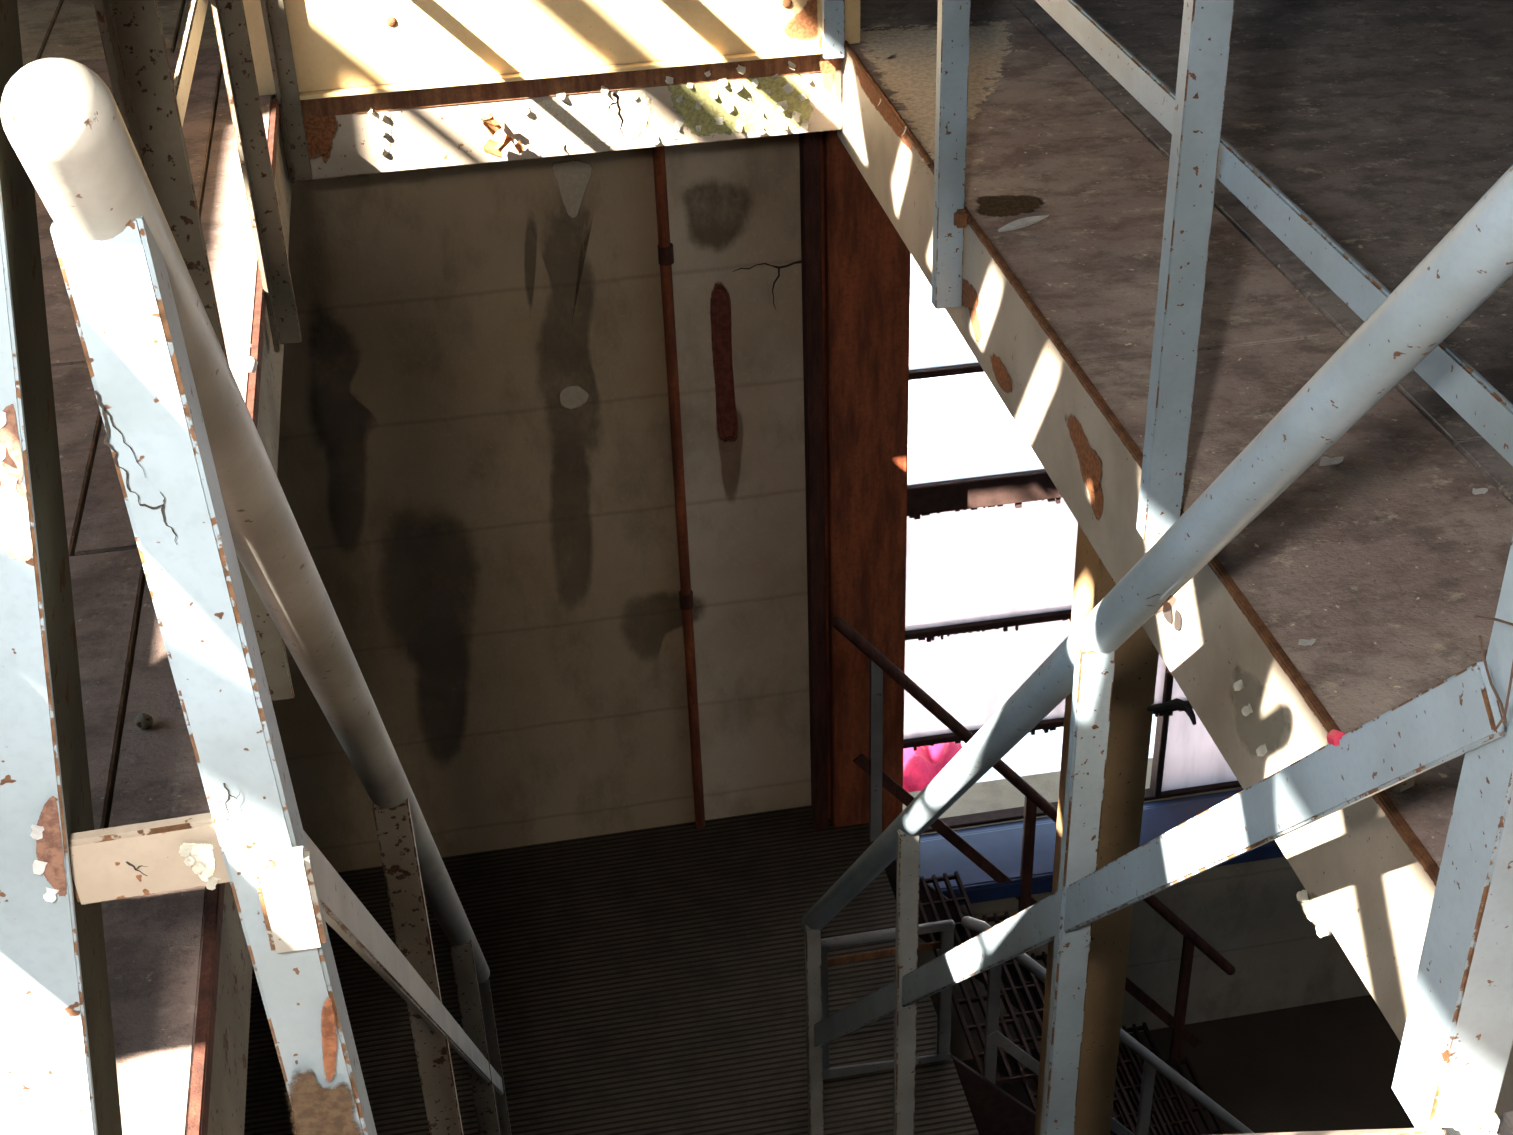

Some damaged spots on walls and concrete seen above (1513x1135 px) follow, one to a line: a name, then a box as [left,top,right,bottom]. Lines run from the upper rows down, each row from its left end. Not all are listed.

rust [300,0,841,163]
peeling [0,404,33,561]
crack [94,390,177,545]
leakage [311,310,372,550]
leakage [525,212,598,601]
rust [710,283,737,442]
rust [1065,415,1104,521]
leakage [382,516,475,759]
peeling [30,796,67,902]